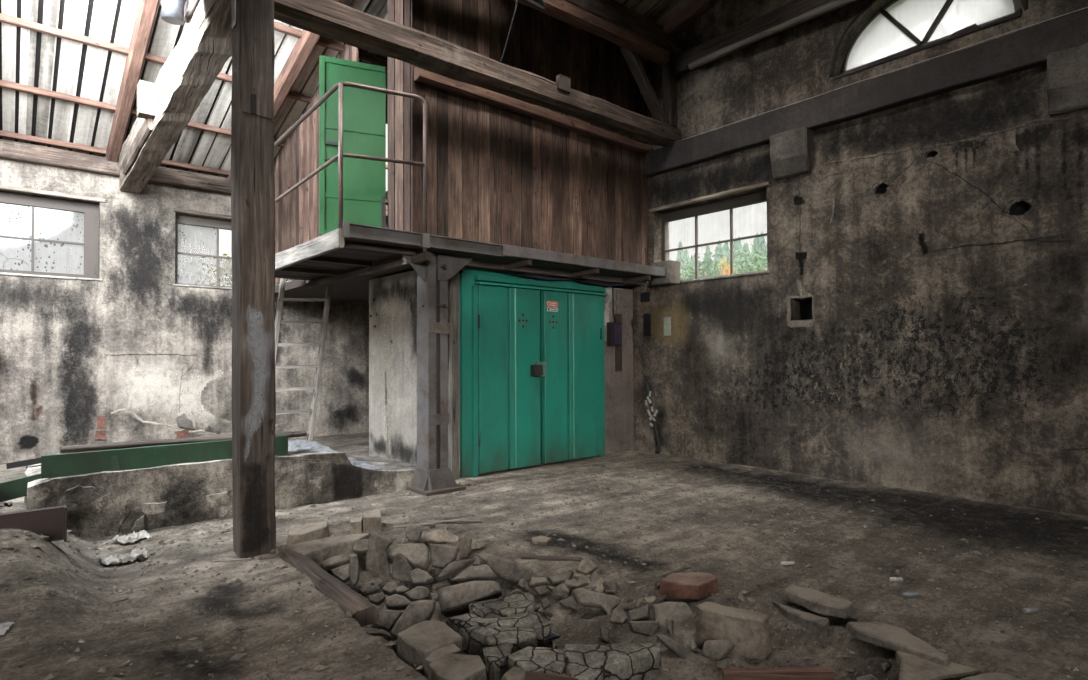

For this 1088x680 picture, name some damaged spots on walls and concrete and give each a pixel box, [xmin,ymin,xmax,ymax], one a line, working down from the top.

leakage [830,73,1052,184]
spalling [870,181,893,198]
crack [888,157,1075,251]
spalling [999,198,1038,218]
leakage [0,285,99,445]
leakage [120,294,232,419]
leakage [650,287,773,359]
leakage [724,281,1073,423]
leakage [649,408,668,447]
leakage [686,464,1088,557]
spalling [321,523,692,640]